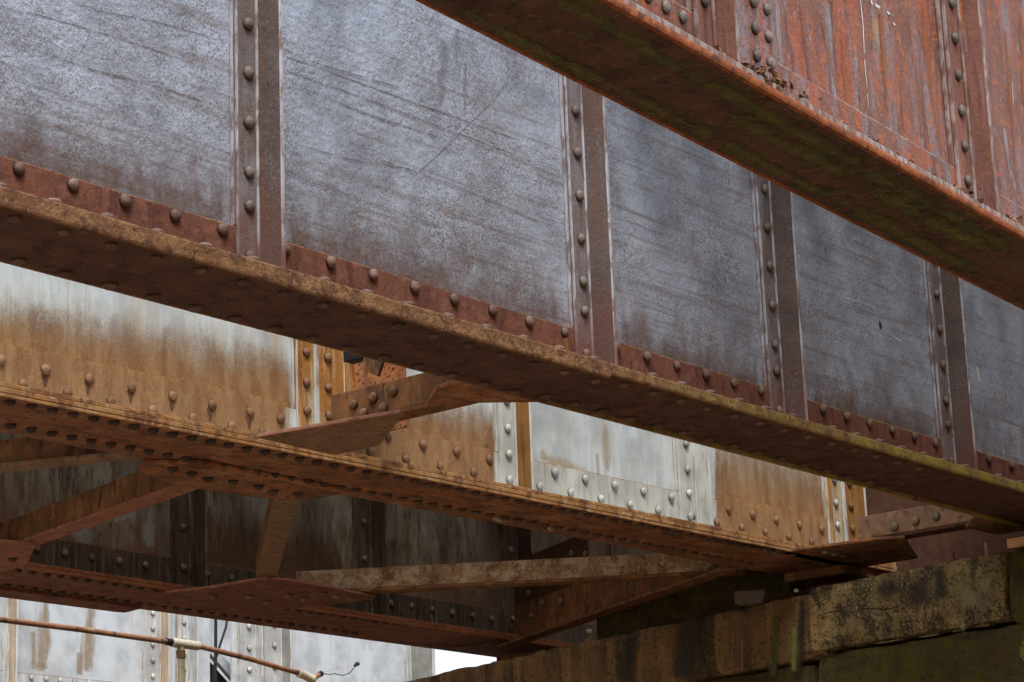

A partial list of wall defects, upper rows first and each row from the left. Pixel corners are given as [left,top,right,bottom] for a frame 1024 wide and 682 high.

rust [0,312,291,433]
rust [351,413,494,481]
rust [716,452,829,546]